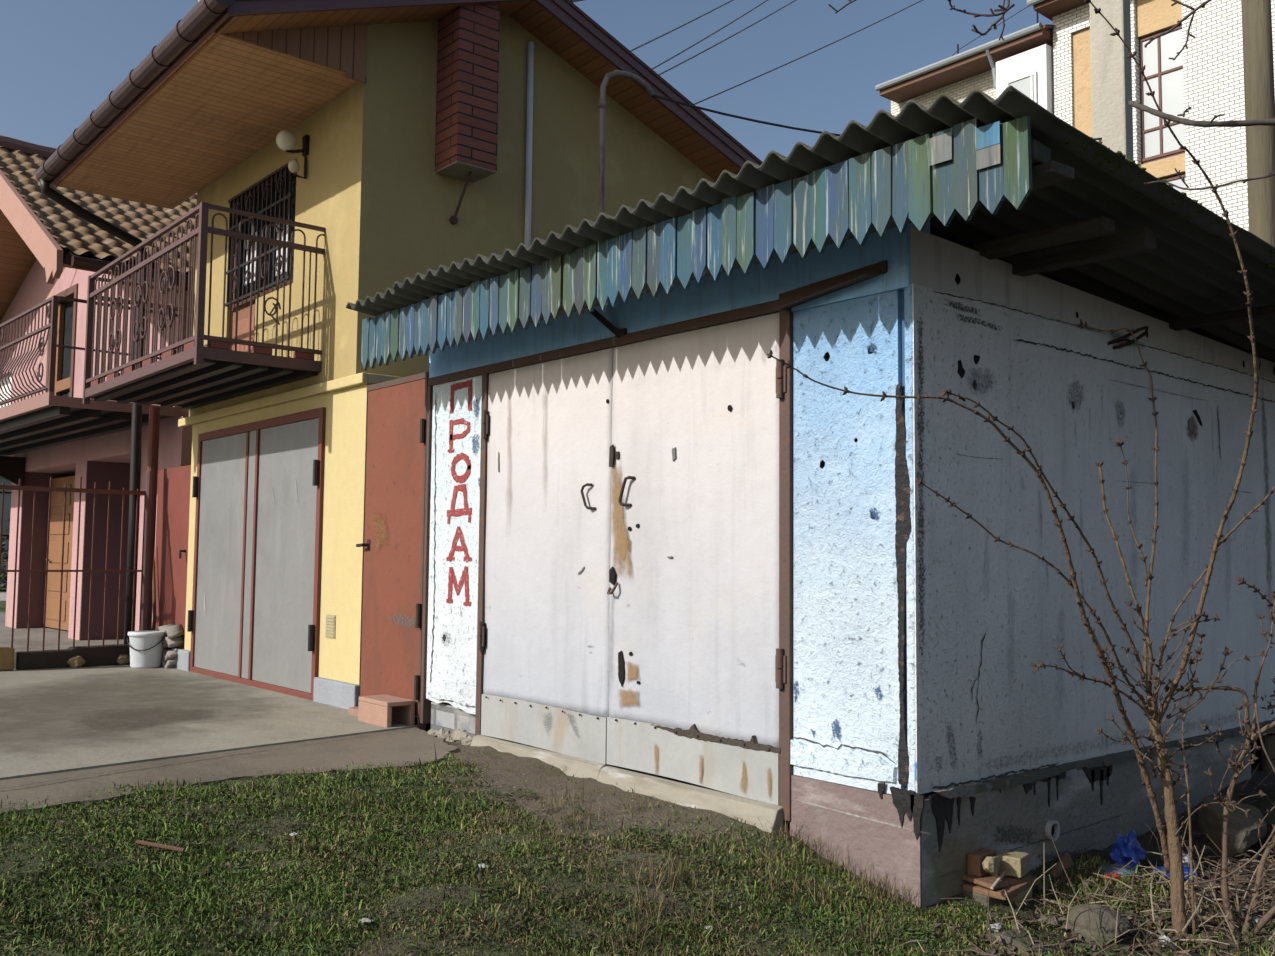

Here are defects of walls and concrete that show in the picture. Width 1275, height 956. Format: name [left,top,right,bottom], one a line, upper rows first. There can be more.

rust [611,467,631,574]
rust [620,663,639,706]